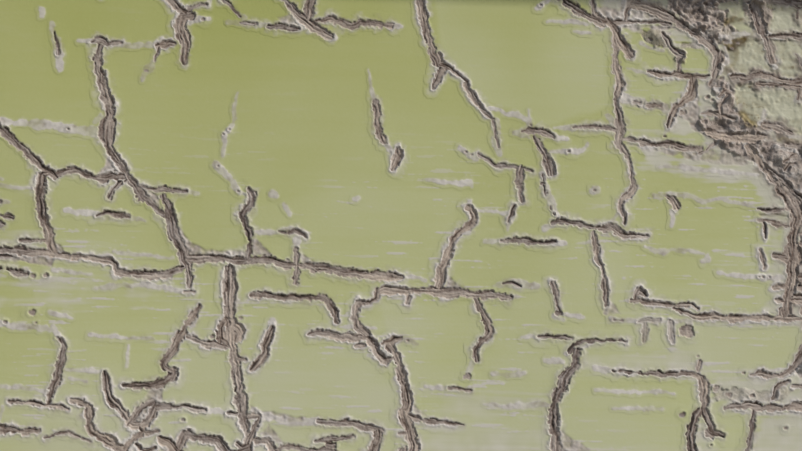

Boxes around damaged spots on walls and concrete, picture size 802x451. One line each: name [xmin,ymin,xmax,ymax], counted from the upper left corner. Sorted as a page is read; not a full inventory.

spalling [531,0,635,29]
peeling [486,103,535,127]
spalling [620,0,802,202]
peeling [549,138,593,160]
spalling [657,187,684,231]
crack [0,0,571,451]
crack [508,0,802,451]
peeling [713,267,786,284]
spalling [677,318,699,345]
peeling [712,375,802,403]